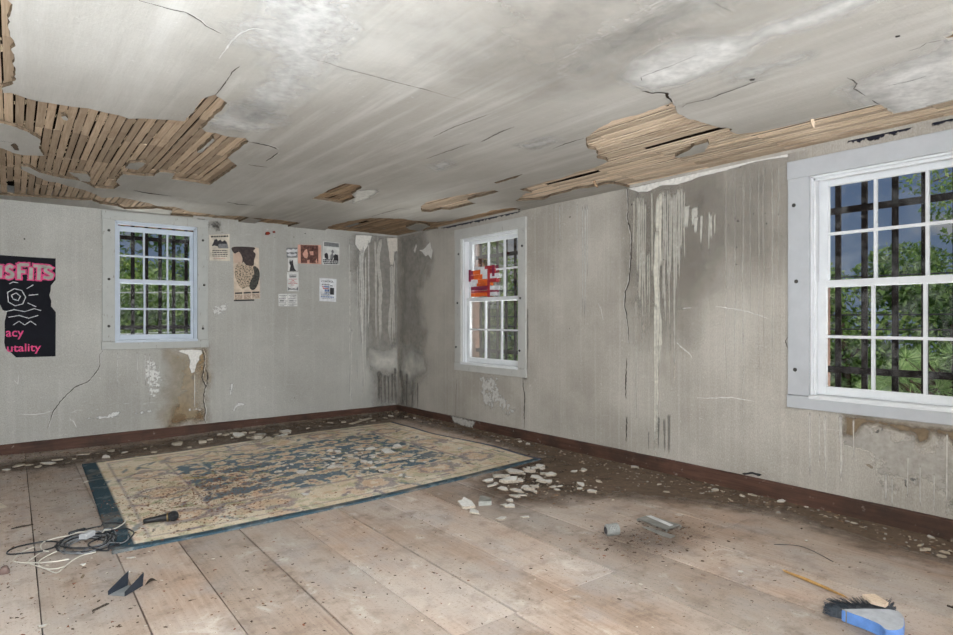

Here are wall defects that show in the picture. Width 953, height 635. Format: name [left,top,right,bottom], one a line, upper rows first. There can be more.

flaking render [0,0,299,227]
flaking render [312,184,362,203]
flaking render [327,100,953,267]
crack [48,351,103,426]
peeling [179,350,202,373]
damp [349,237,428,404]
crack [623,188,632,438]
damp [633,189,763,448]